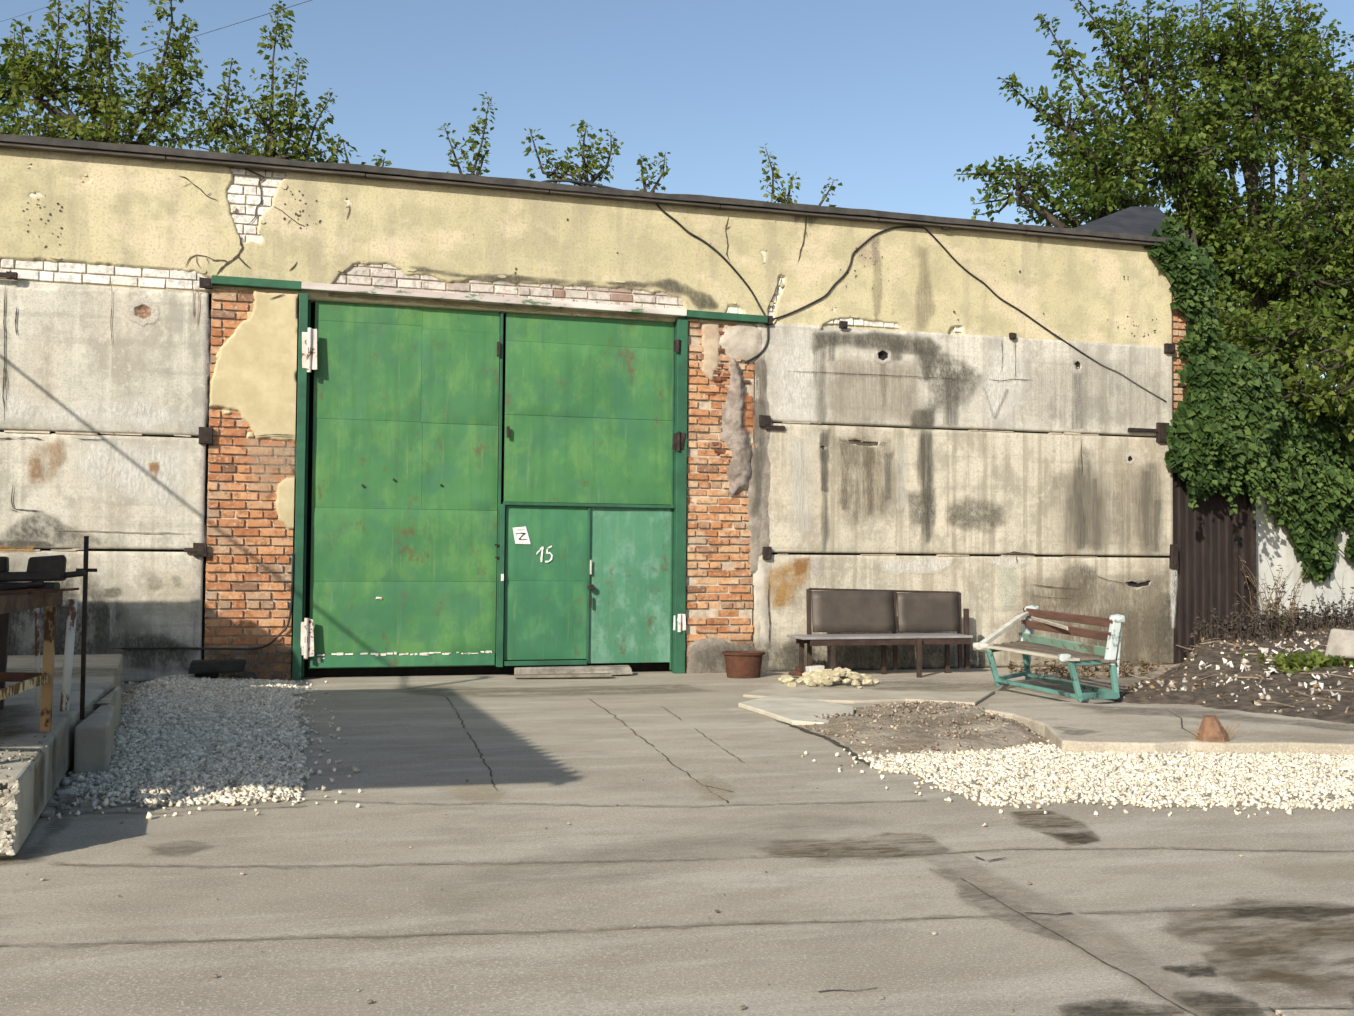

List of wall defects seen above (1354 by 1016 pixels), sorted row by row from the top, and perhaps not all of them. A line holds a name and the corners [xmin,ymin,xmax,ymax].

crack [185,168,304,274]
flaking render [227,168,321,243]
flaking render [334,263,684,310]
flaking render [209,290,298,443]
spalling [705,331,751,395]
damp [755,332,1022,532]
flaking render [275,477,294,530]
rust [770,559,809,604]
spalling [0,777,20,856]